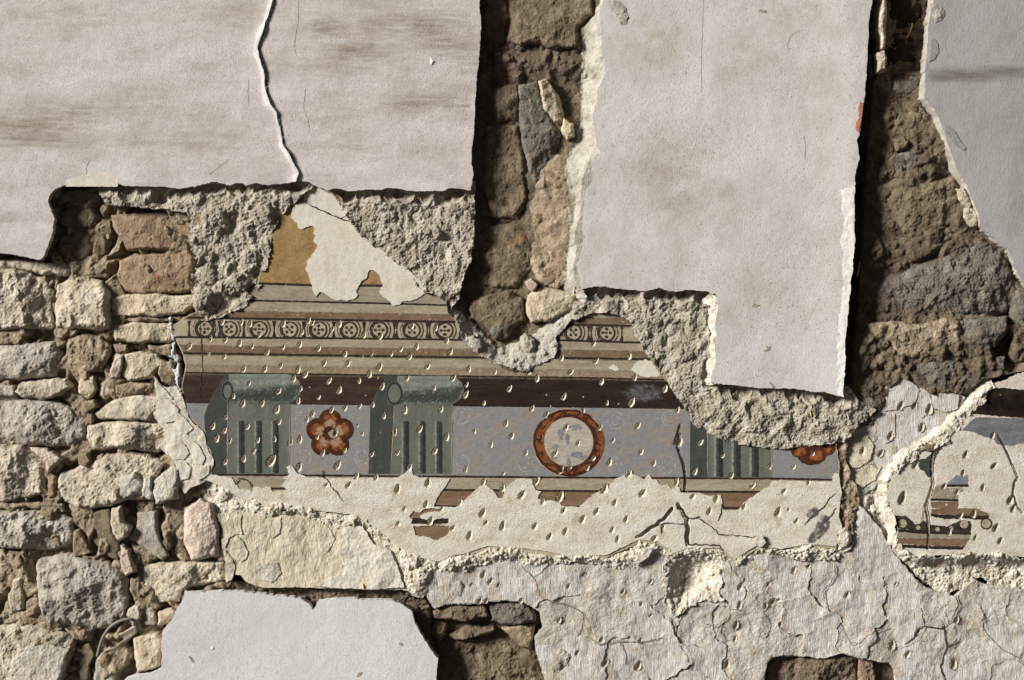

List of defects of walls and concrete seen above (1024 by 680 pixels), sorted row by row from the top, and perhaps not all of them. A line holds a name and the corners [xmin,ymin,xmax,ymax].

crack [248,0,348,221]
spalling [917,0,1024,288]
spalling [66,0,966,498]
spalling [0,186,1024,680]
crack [638,427,755,551]
crack [921,454,934,549]
crack [522,567,690,670]
crack [823,563,885,646]
crack [905,597,1017,680]